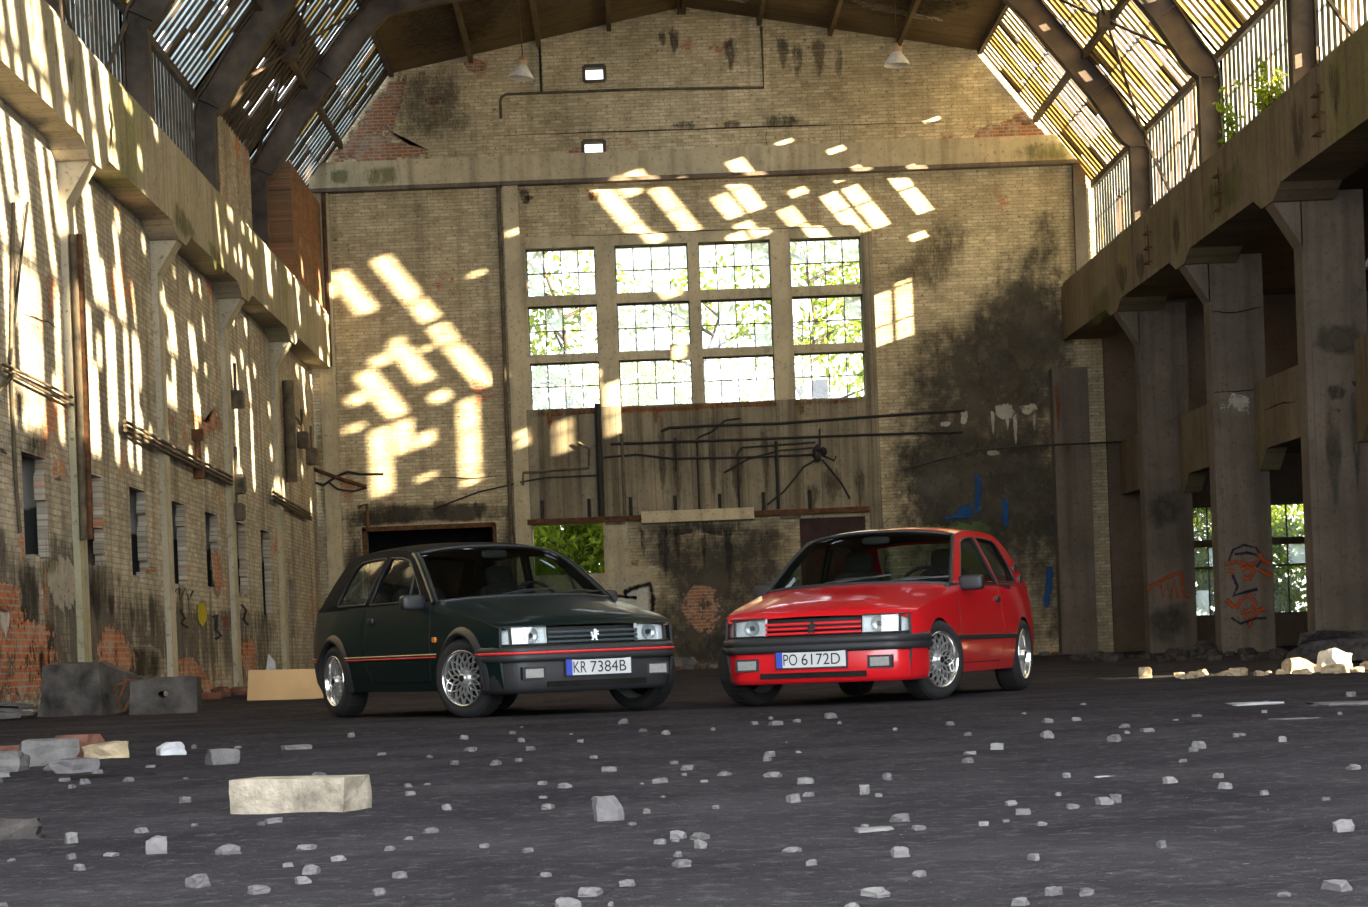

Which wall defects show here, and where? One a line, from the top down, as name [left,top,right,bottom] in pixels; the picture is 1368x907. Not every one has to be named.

leakage [659,31,678,53]
leakage [724,40,735,69]
leakage [778,42,842,74]
flaking render [331,73,430,162]
flaking render [974,112,1047,138]
peeling [940,410,968,427]
peeling [987,403,1038,456]
flaking render [45,553,76,613]
flaking render [211,549,223,598]
flaking render [678,585,725,634]
flaking render [0,581,60,703]
flaking render [97,623,143,712]